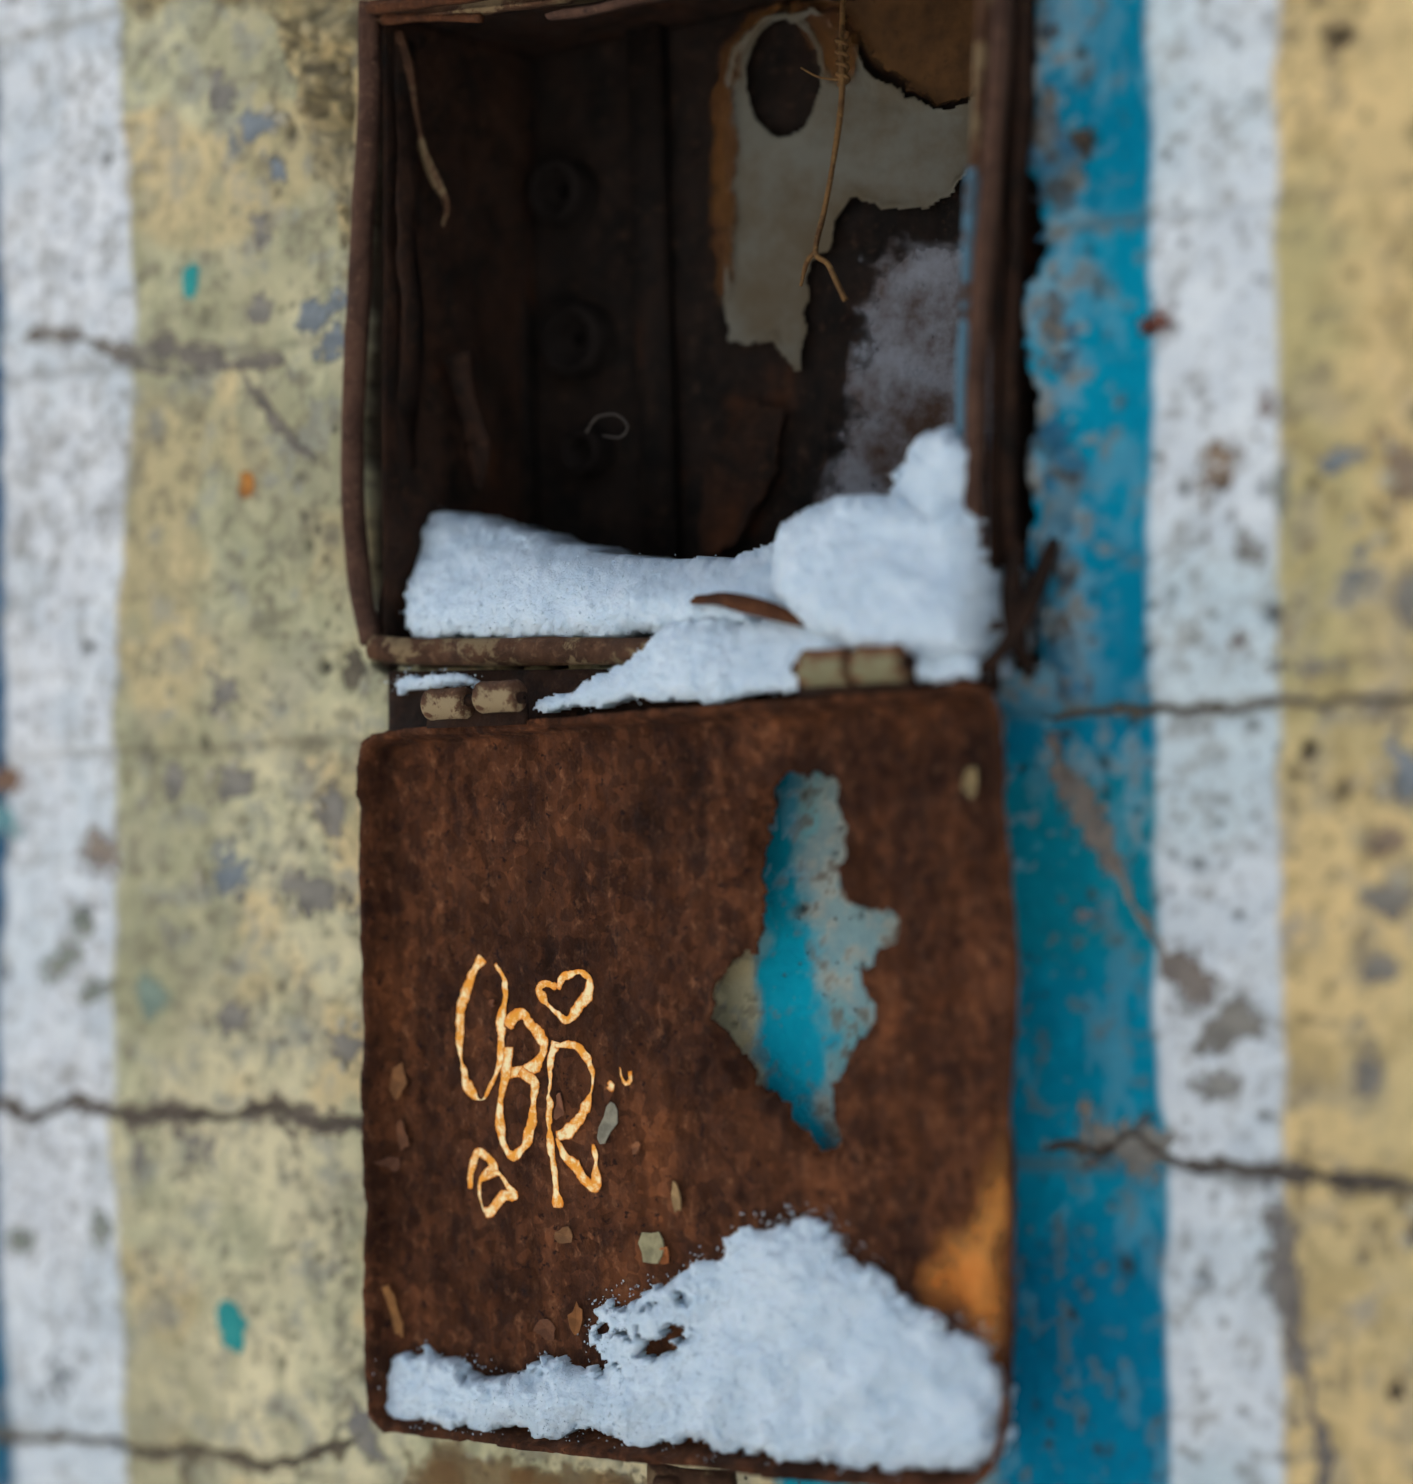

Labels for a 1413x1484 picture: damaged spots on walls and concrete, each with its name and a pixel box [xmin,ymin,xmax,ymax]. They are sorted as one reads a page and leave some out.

spalling [124,0,168,22]
spalling [205,0,360,254]
spalling [1028,83,1096,264]
spalling [246,268,348,363]
spalling [1025,289,1083,377]
crack [21,316,317,461]
spalling [1025,388,1093,708]
crack [0,1085,363,1158]
crack [1041,1110,1413,1484]
crack [0,1431,359,1484]
rust [403,1439,647,1484]